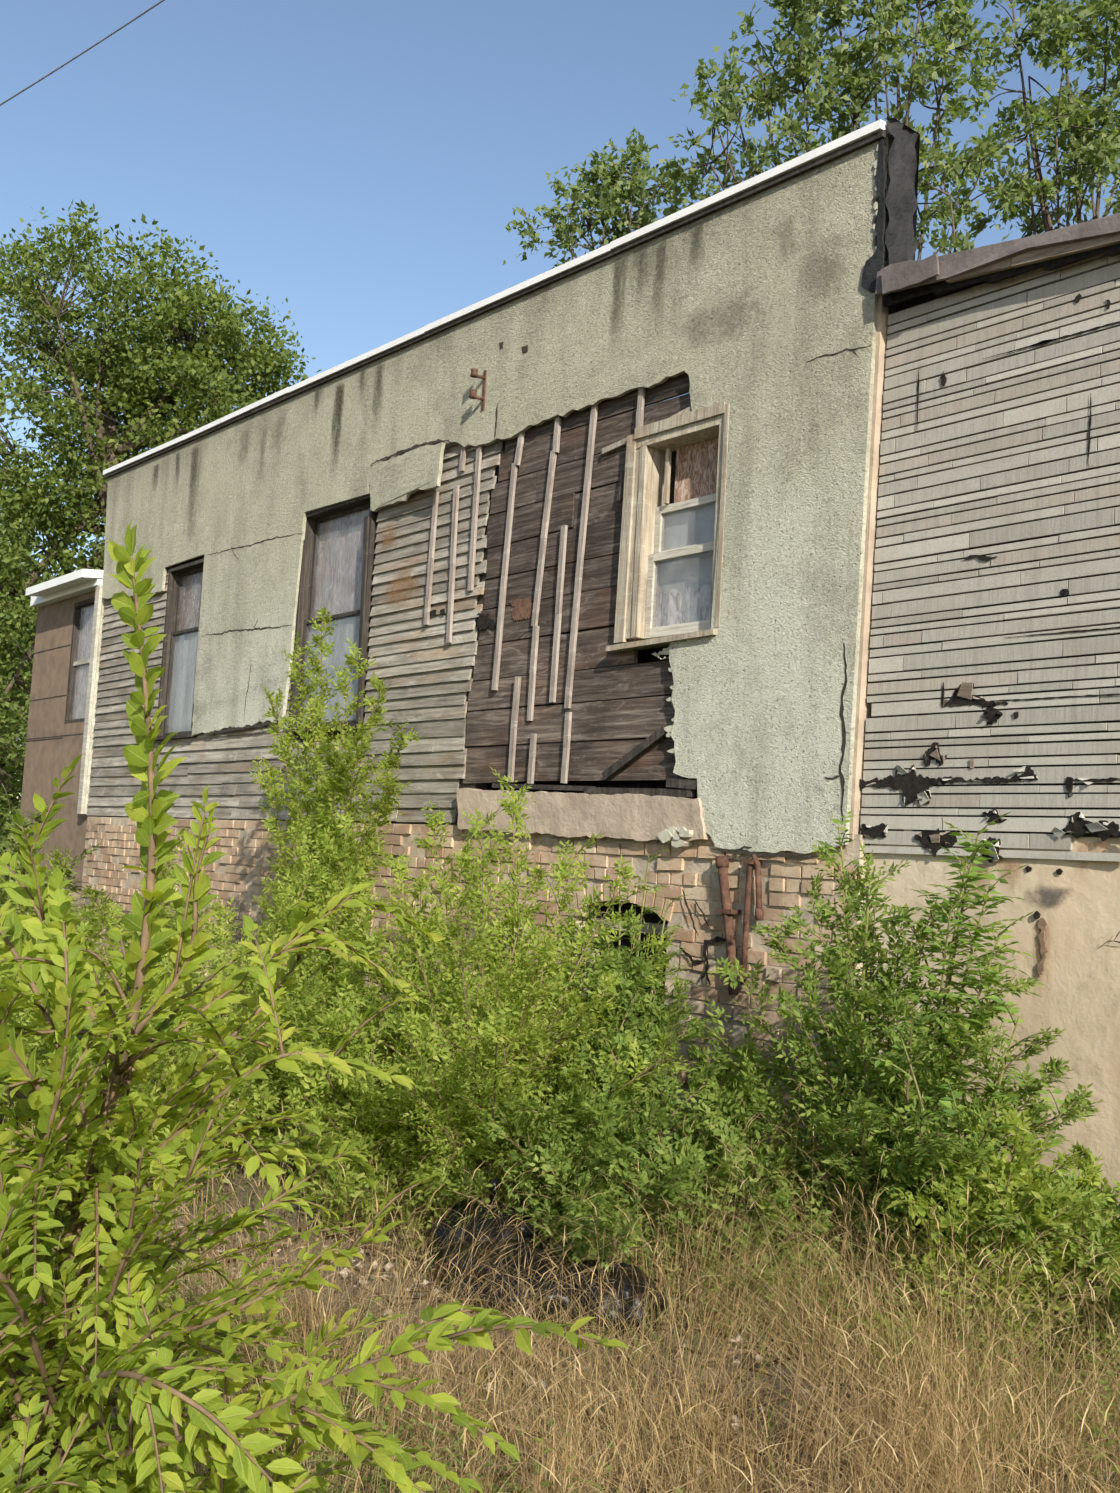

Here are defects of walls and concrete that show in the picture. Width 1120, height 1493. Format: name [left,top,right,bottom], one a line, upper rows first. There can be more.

damp [614,241,666,305]
spalling [664,668,675,754]
peeling [942,682,1018,725]
peeling [896,746,951,806]
peeling [918,831,950,854]
peeling [981,810,1005,859]
peeling [1052,814,1111,838]
corrosion [1033,911,1048,975]